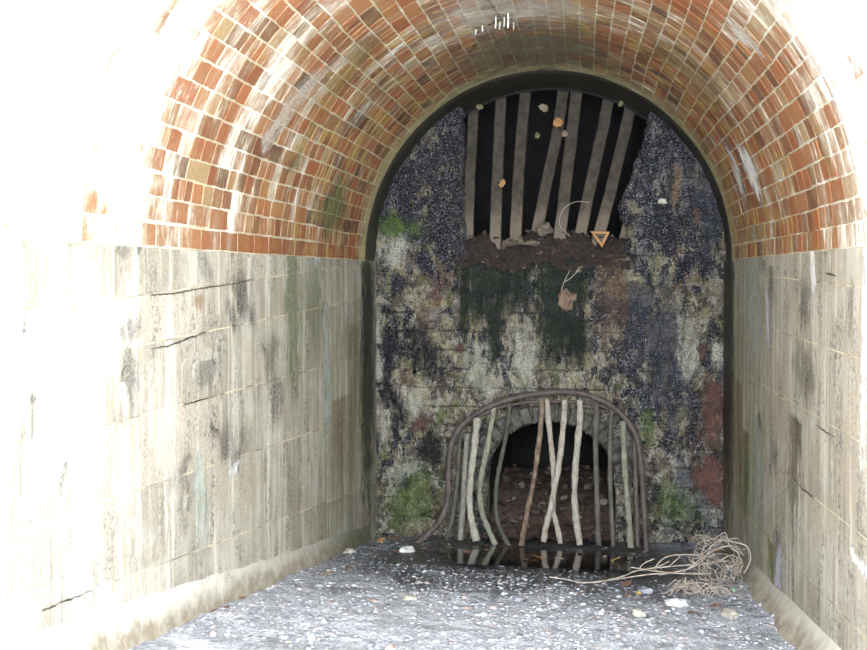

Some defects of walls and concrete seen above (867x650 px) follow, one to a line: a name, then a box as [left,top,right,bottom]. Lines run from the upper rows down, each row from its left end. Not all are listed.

water stain [360,0,735,524]
crack [151,281,249,296]
crack [152,332,206,349]
crack [767,385,834,437]
crack [42,590,92,611]